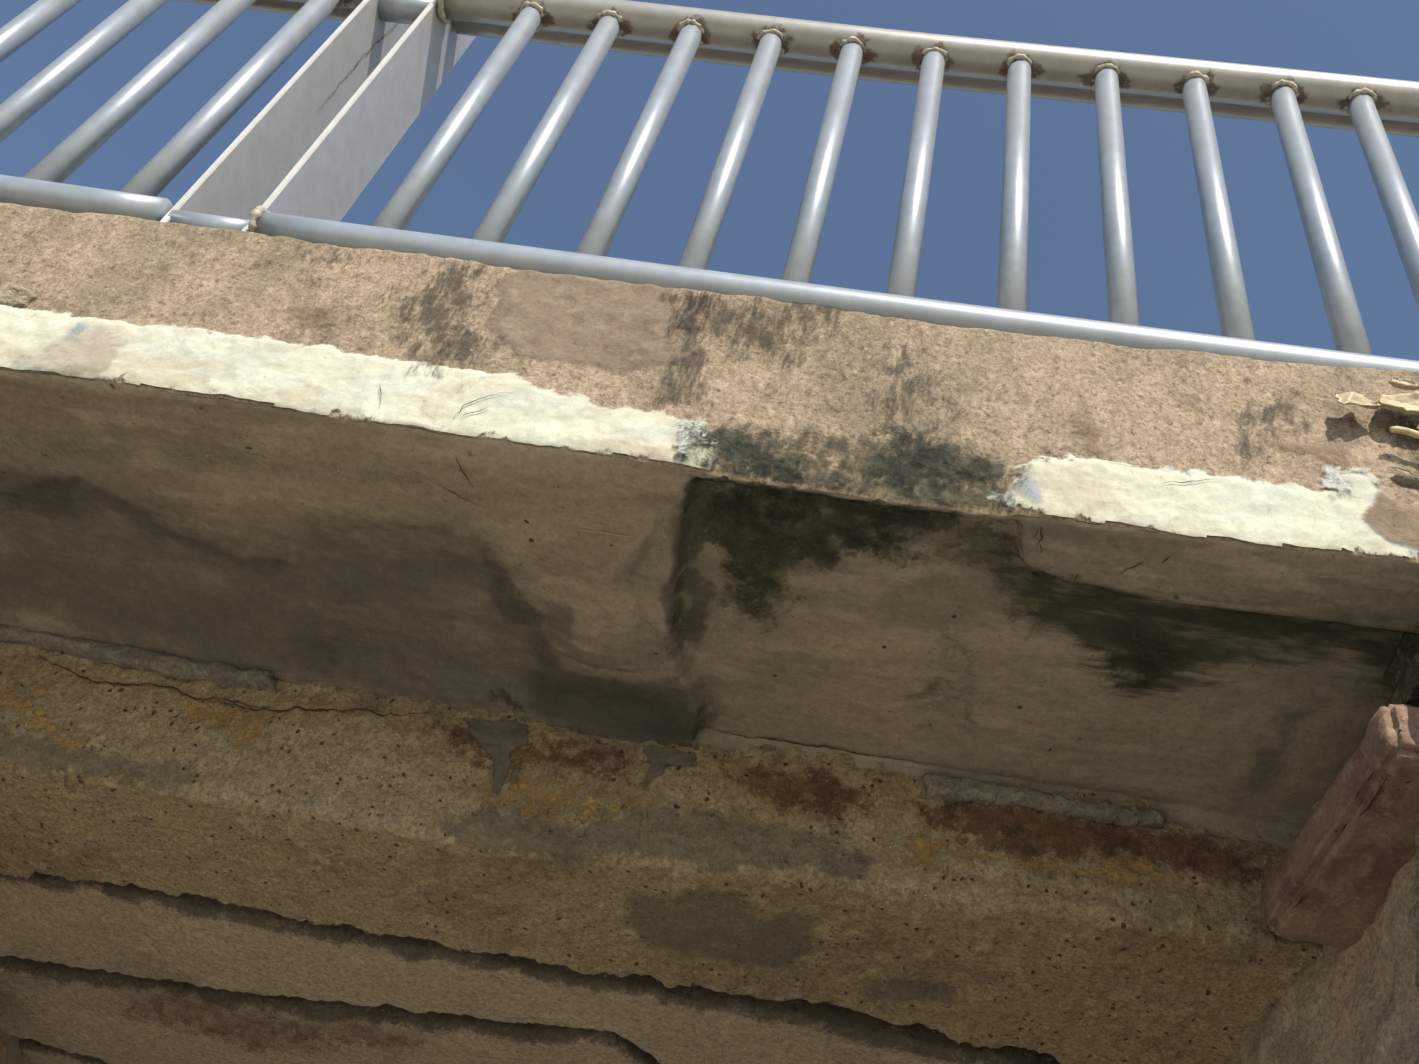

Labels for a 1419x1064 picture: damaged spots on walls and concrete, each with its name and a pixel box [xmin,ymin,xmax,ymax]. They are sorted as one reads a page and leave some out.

peeling [0,284,38,308]
water stain [673,419,718,462]
water stain [986,481,1038,505]
spalling [1363,474,1419,546]
water stain [663,477,725,642]
corrosion [720,760,882,821]
corrosion [917,793,1264,888]